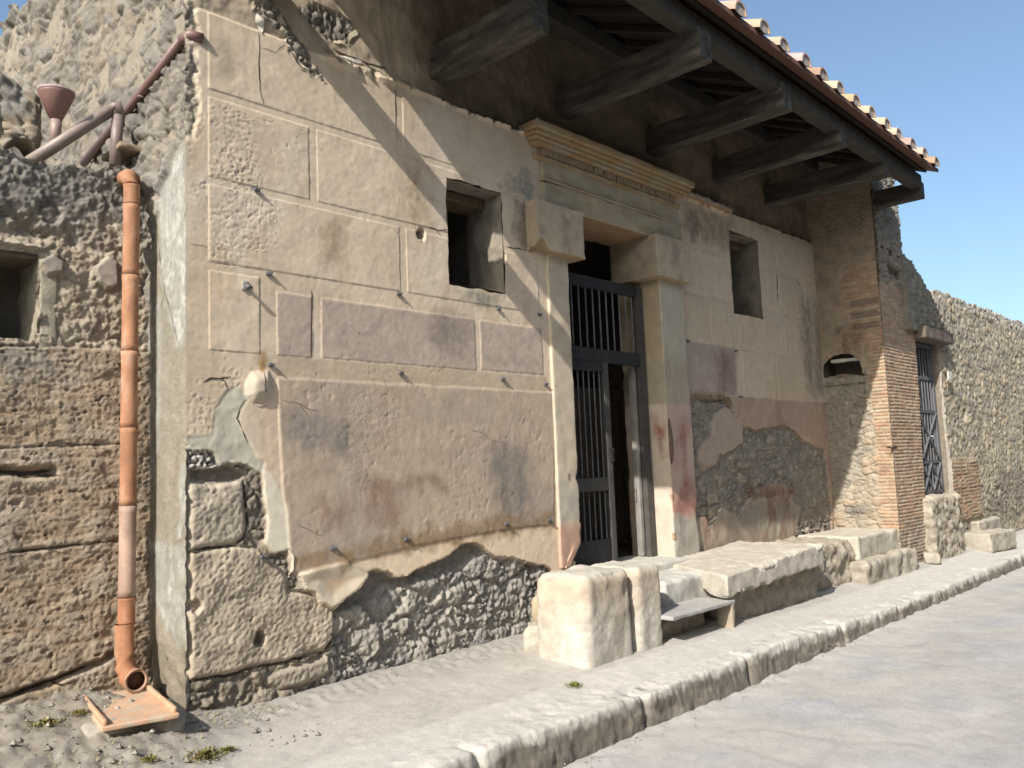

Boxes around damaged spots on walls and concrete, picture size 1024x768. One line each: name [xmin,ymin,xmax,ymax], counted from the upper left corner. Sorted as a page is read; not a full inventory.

crack [258,31,284,100]
spalling [250,0,327,83]
spalling [299,0,362,63]
crack [203,376,248,444]
spalling [690,398,833,537]
spalling [185,444,317,593]
spalling [184,542,552,712]